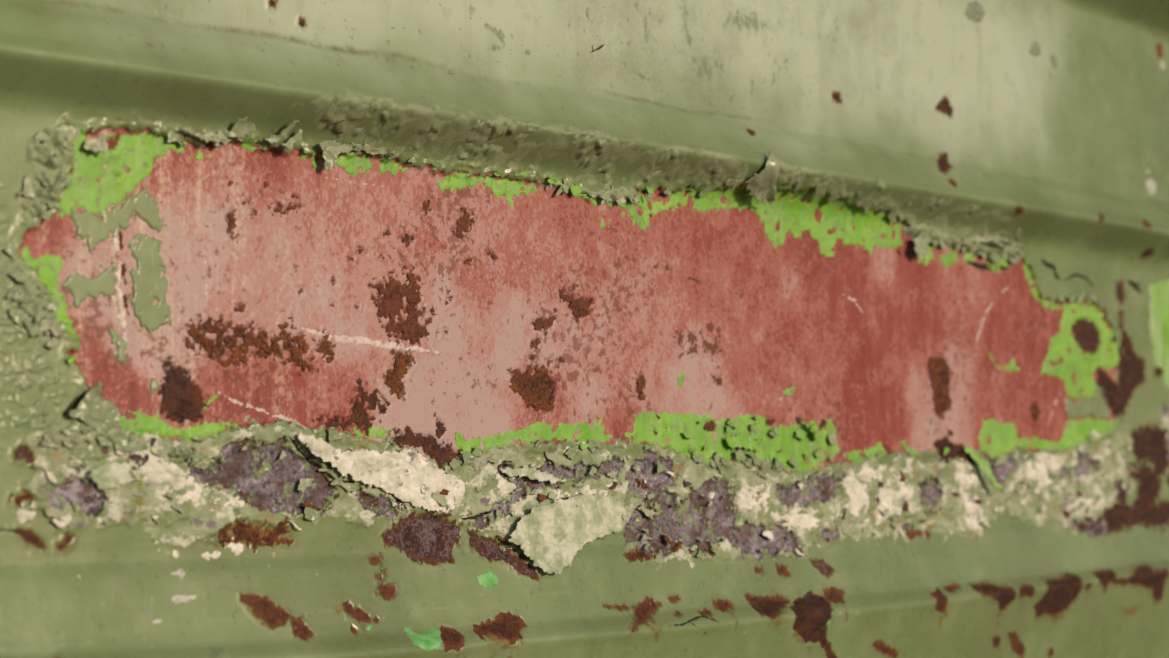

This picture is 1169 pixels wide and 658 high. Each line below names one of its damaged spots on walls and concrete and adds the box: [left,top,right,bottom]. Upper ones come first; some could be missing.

corrosion [157,356,210,427]
corrosion [185,303,337,376]
corrosion [313,254,463,469]
corrosion [508,277,594,413]
peeling [13,117,1139,588]
corrosion [928,356,976,465]
corrosion [1071,280,1164,421]
corrosion [1073,420,1169,538]
peeling [172,595,197,604]
corrosion [369,509,541,600]
corrosion [745,559,848,658]
corrosion [929,565,1169,658]